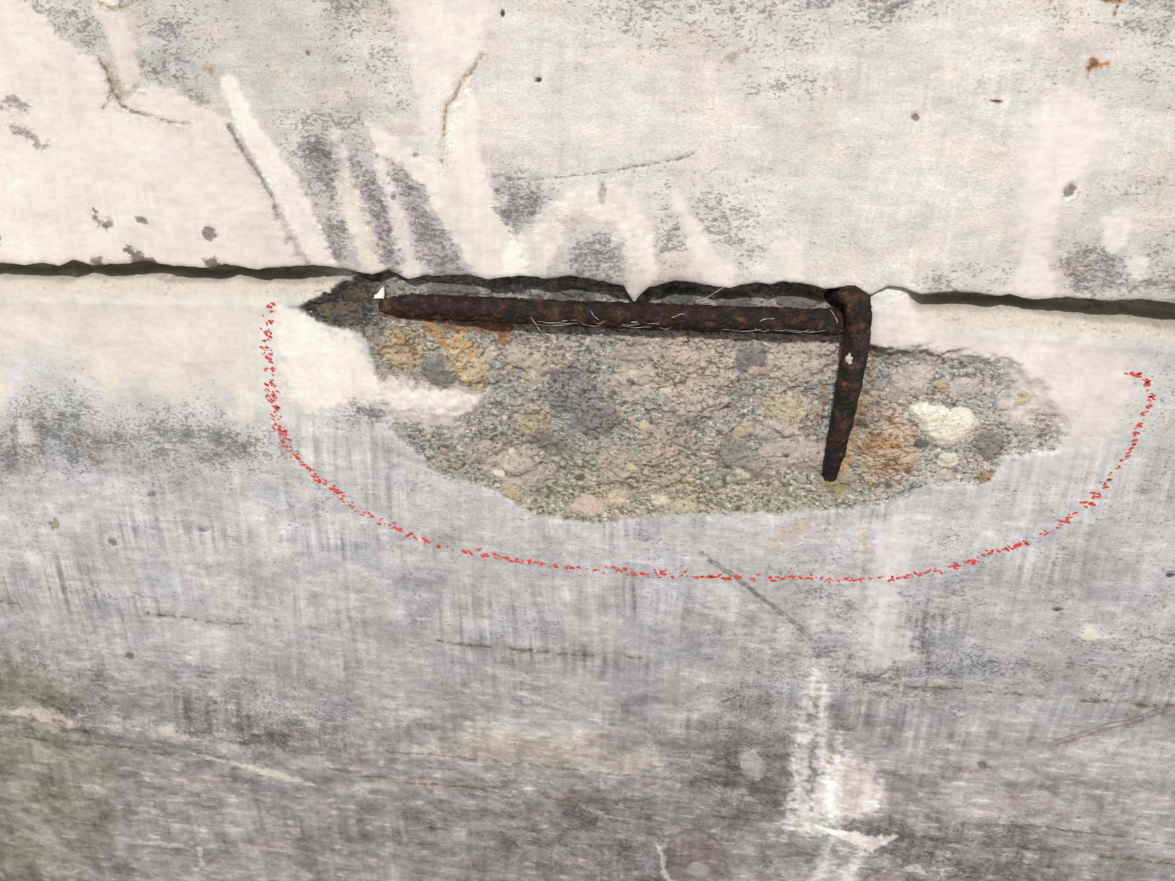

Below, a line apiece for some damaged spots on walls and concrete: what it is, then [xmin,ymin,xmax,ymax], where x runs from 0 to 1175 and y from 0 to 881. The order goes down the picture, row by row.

water stain [852,0,928,32]
rust [1097,0,1129,19]
rust [1083,52,1112,81]
water stain [0,0,665,301]
water stain [666,191,741,288]
water stain [768,236,808,284]
water stain [995,81,1175,303]
water stain [341,369,494,441]
rust [374,307,517,391]
spalling [299,270,1060,525]
rust [819,345,907,497]
water stain [393,661,893,881]